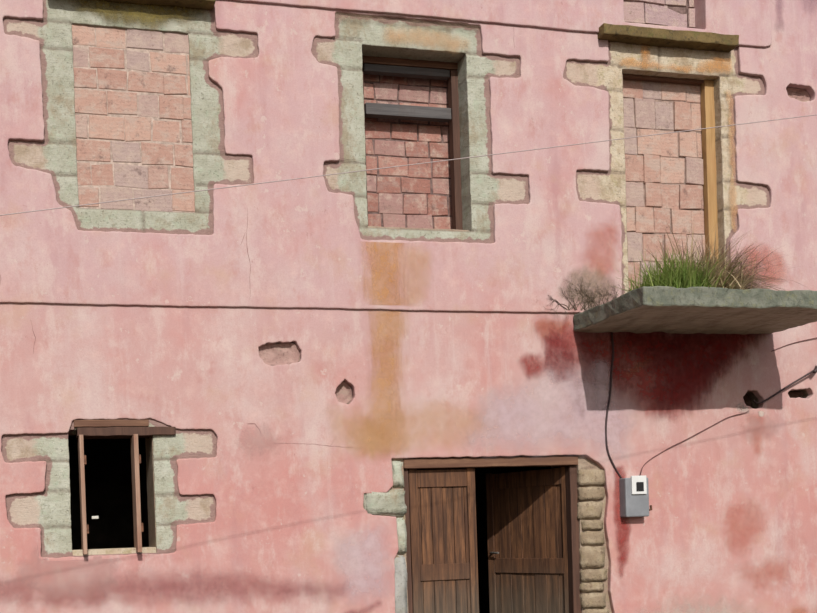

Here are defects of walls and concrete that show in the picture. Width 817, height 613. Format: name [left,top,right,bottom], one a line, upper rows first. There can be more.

hole [259,343,300,365]
hole [335,381,352,404]
damp [484,325,750,450]